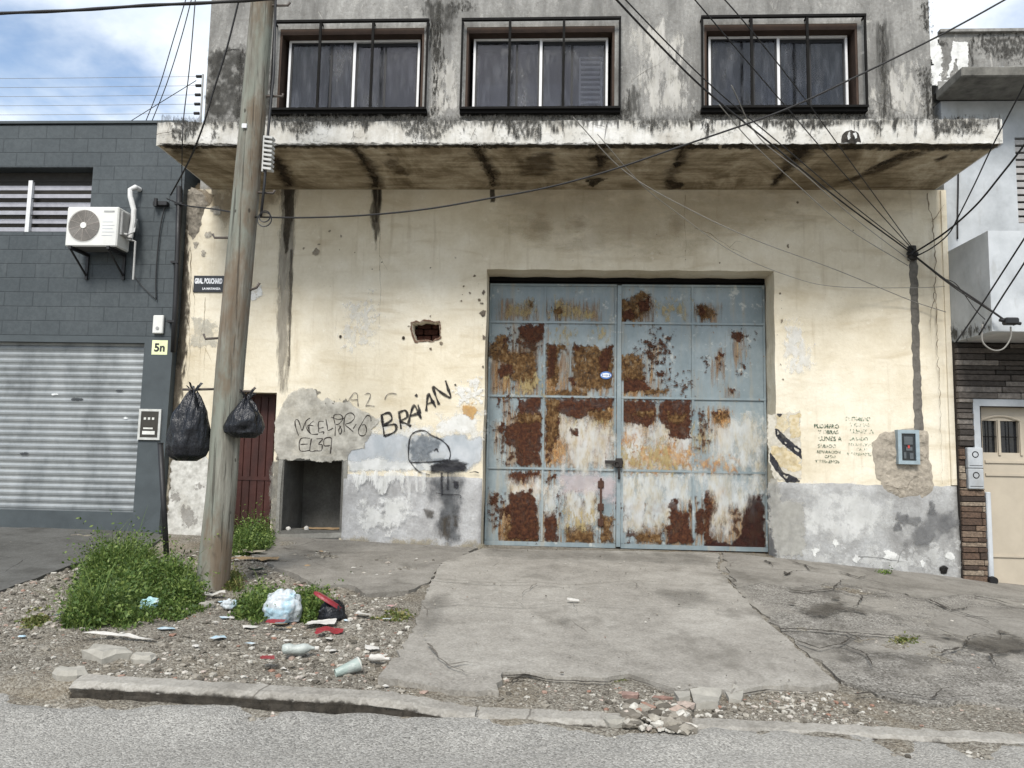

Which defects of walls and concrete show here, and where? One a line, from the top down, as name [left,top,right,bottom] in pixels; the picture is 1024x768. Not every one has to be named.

leakage [157,47,246,156]
mould [969,32,1024,67]
leakage [265,0,1001,391]
spalling [402,315,443,350]
peeling [274,388,440,472]
rust [487,290,766,552]
peeling [766,477,807,559]
crack [764,550,1019,702]